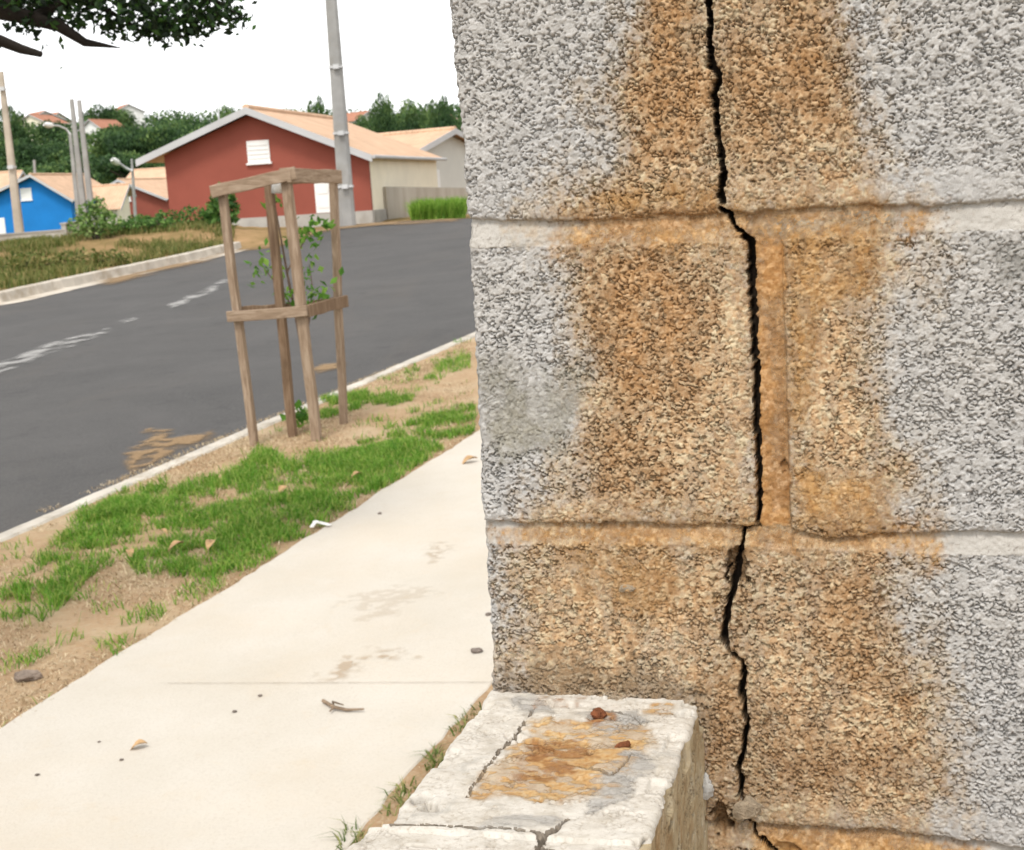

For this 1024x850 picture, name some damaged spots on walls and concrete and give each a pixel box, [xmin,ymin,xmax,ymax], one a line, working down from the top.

corrosion [472,0,981,850]
crack [704,0,778,850]